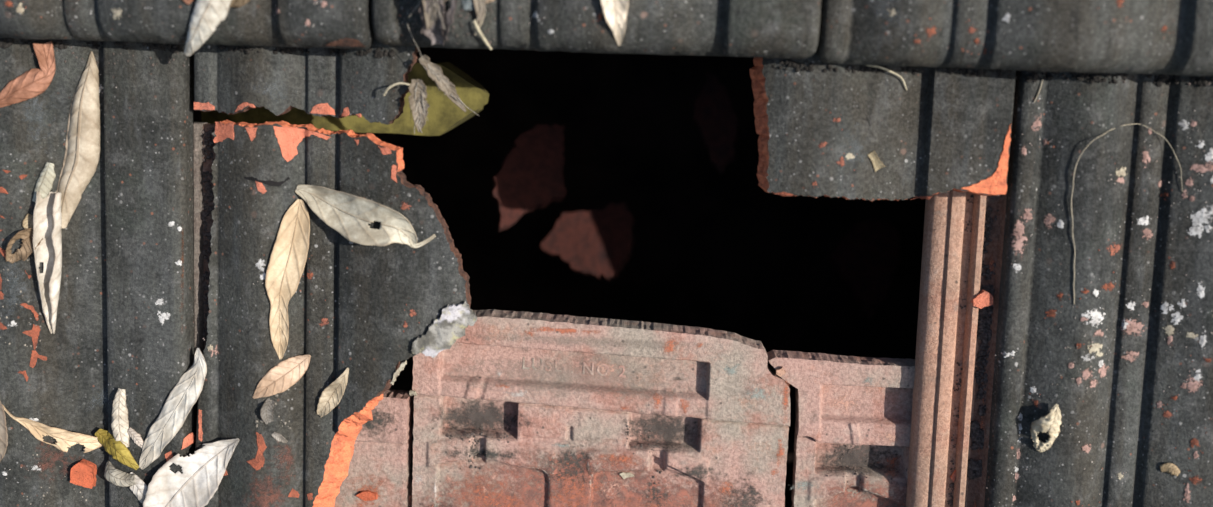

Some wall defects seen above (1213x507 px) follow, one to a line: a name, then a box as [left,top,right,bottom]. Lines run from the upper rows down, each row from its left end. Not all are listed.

spalling [750,20,1016,202]
spalling [165,36,471,507]
peeling [971,290,993,309]